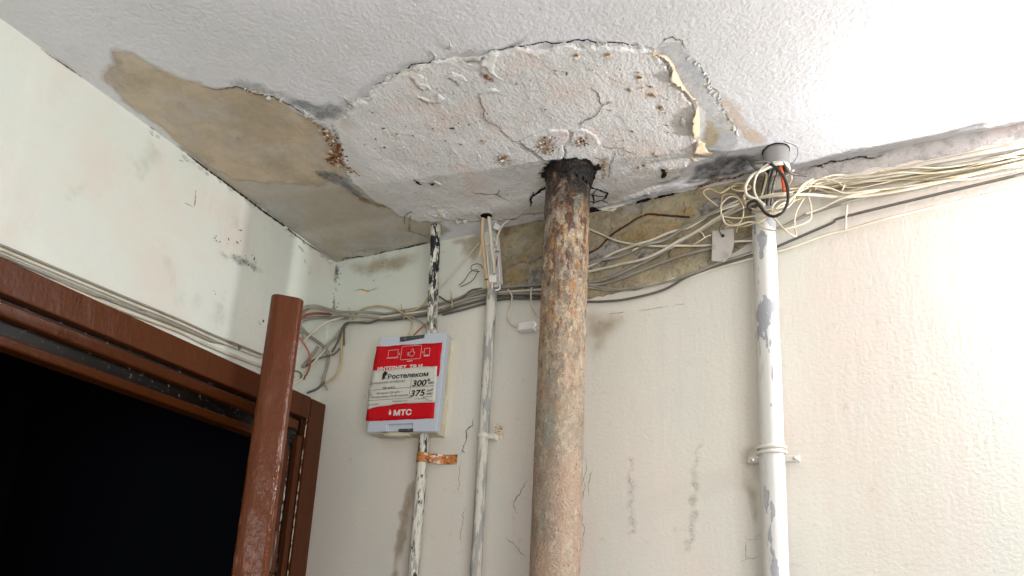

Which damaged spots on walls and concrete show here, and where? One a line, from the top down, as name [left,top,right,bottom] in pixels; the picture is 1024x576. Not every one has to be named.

peeling [401,40,502,105]
corrosion [313,122,361,177]
crack [479,98,519,142]
crack [472,187,545,206]
corrosion [528,130,595,155]
crack [580,88,611,129]
peeling [627,51,713,162]
water stain [689,156,755,182]
flaking render [587,153,767,299]
flaking render [495,220,544,298]